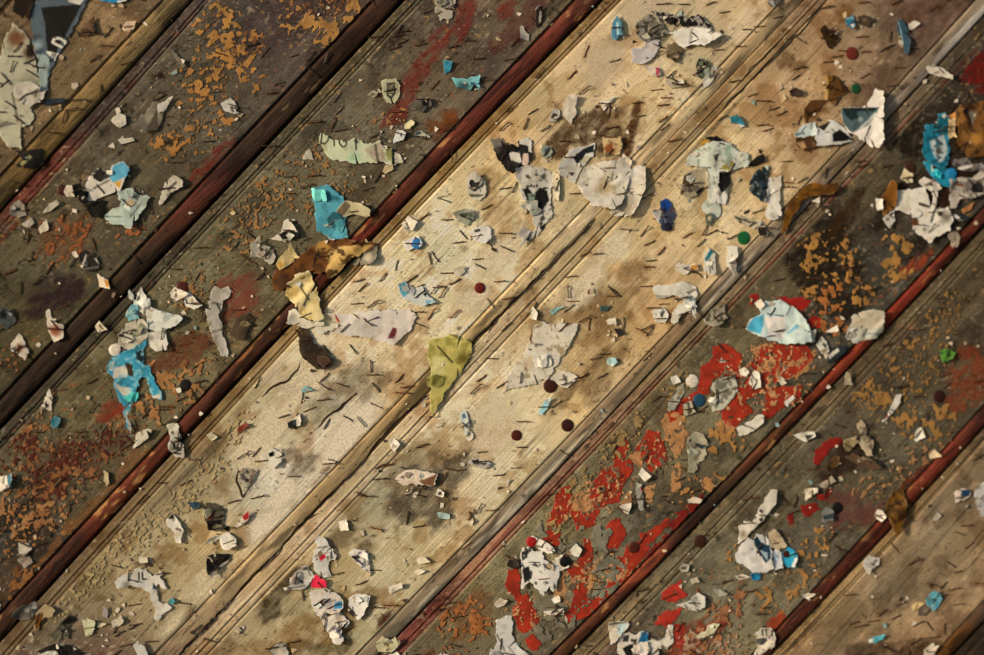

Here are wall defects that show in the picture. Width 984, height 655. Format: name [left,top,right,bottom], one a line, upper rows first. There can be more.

peeling [149,0,361,170]
peeling [0,357,256,624]
peeling [437,228,914,655]
peeling [842,291,972,501]